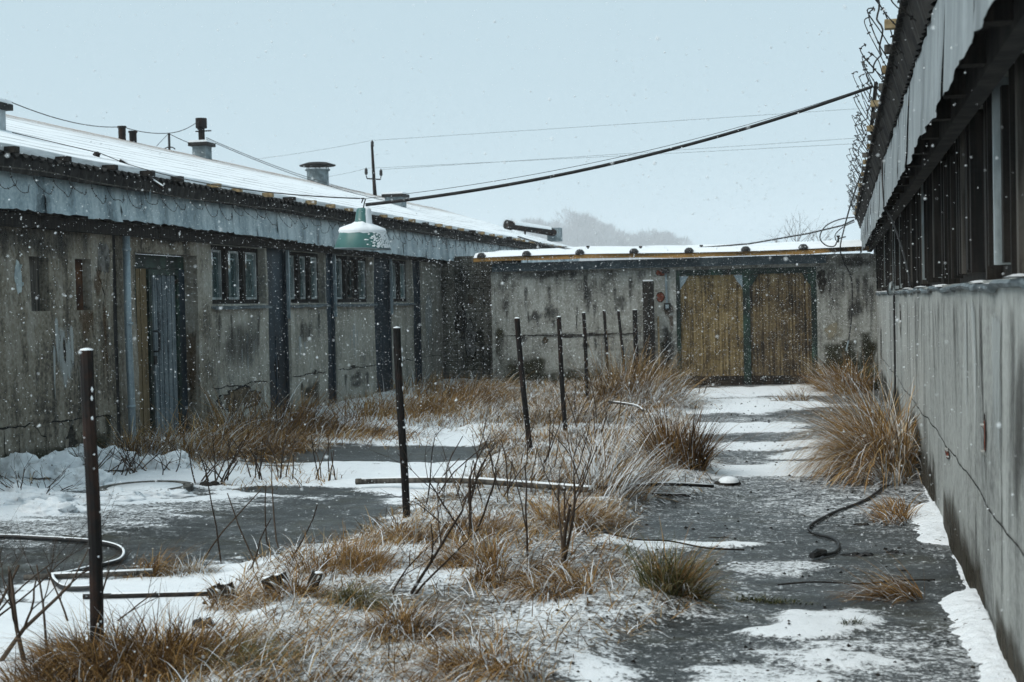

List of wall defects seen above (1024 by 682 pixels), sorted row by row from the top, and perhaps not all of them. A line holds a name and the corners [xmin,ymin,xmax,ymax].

leakage [524,270,595,310]
leakage [842,256,873,318]
leakage [528,308,604,349]
leakage [825,323,881,366]
crack [212,380,266,394]
crack [0,415,116,457]